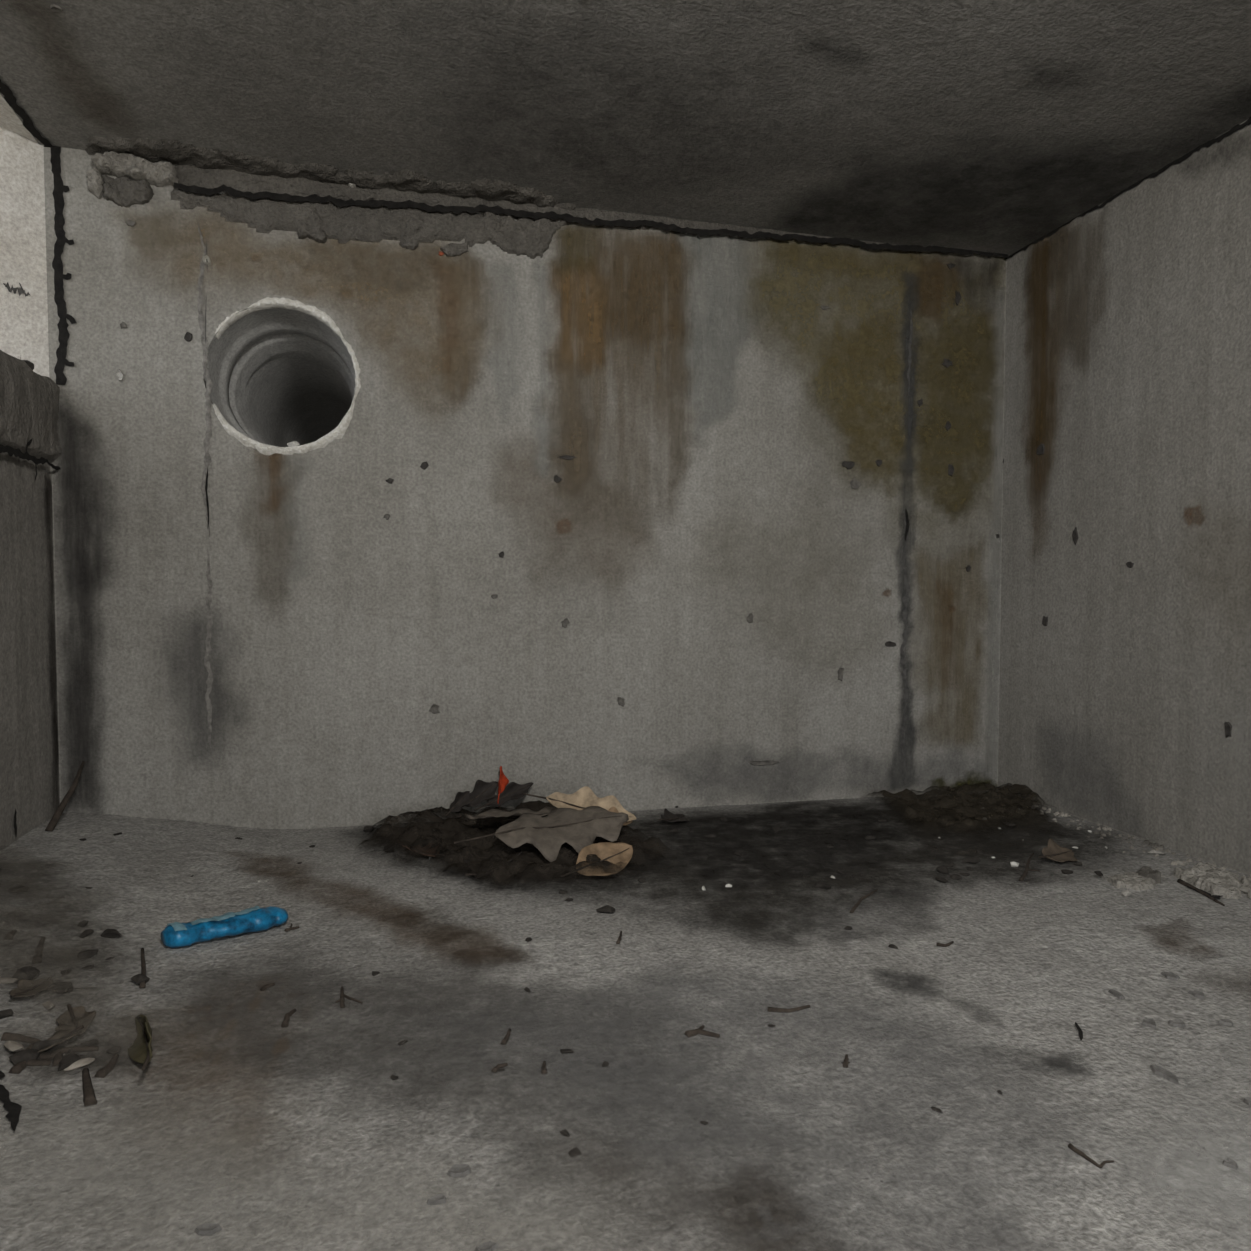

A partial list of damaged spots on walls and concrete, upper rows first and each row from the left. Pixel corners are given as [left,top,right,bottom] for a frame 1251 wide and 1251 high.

spalling [85,136,578,244]
crack [202,237,210,344]
crack [0,438,60,480]
crack [203,469,211,526]